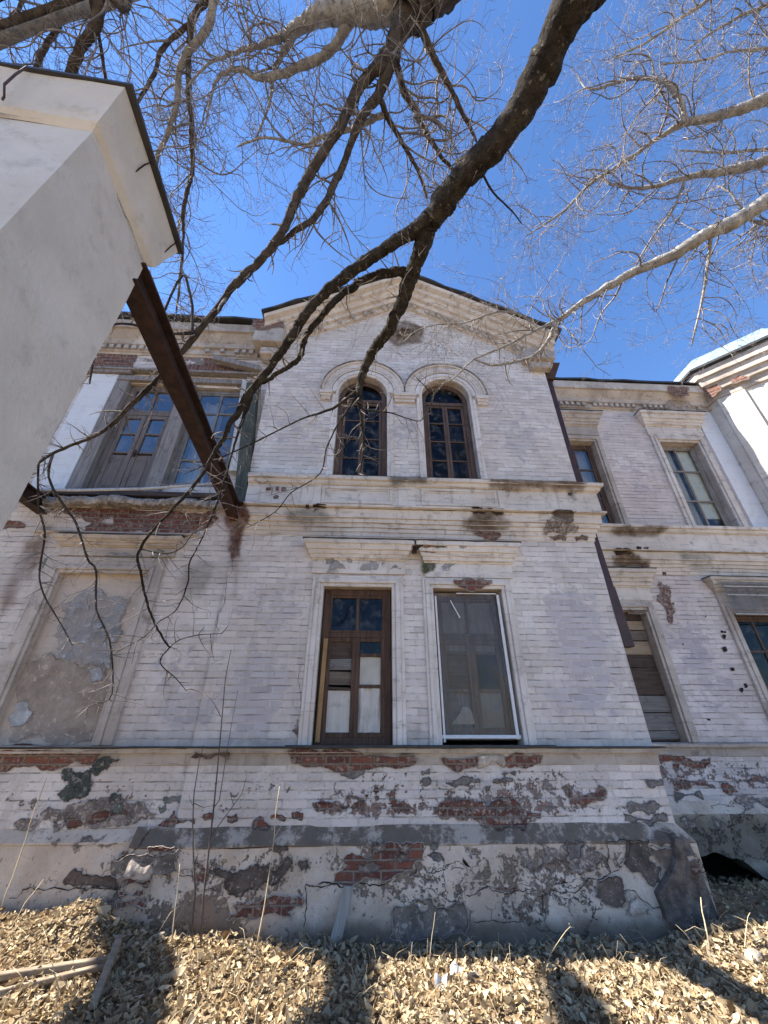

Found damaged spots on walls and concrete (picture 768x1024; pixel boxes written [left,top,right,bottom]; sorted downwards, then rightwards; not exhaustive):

flaking render [62,507,218,537]
rust [224,502,250,558]
flaking render [657,572,675,623]
peeling [0,587,128,773]
peeling [13,793,212,850]
flaking render [251,748,431,830]
peeling [435,752,543,831]
flaking render [516,754,768,917]
flaking render [110,845,179,910]
peeling [210,845,309,921]
crack [304,881,385,925]
crack [466,839,694,923]